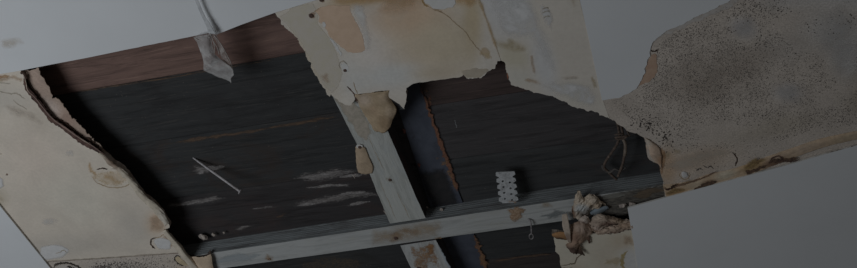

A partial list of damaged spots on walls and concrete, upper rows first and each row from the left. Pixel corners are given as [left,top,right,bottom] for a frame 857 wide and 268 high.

peeling [281,4,365,92]
leakage [462,68,488,78]
leakage [613,0,857,173]
peeling [644,137,662,167]
leakage [597,185,665,215]